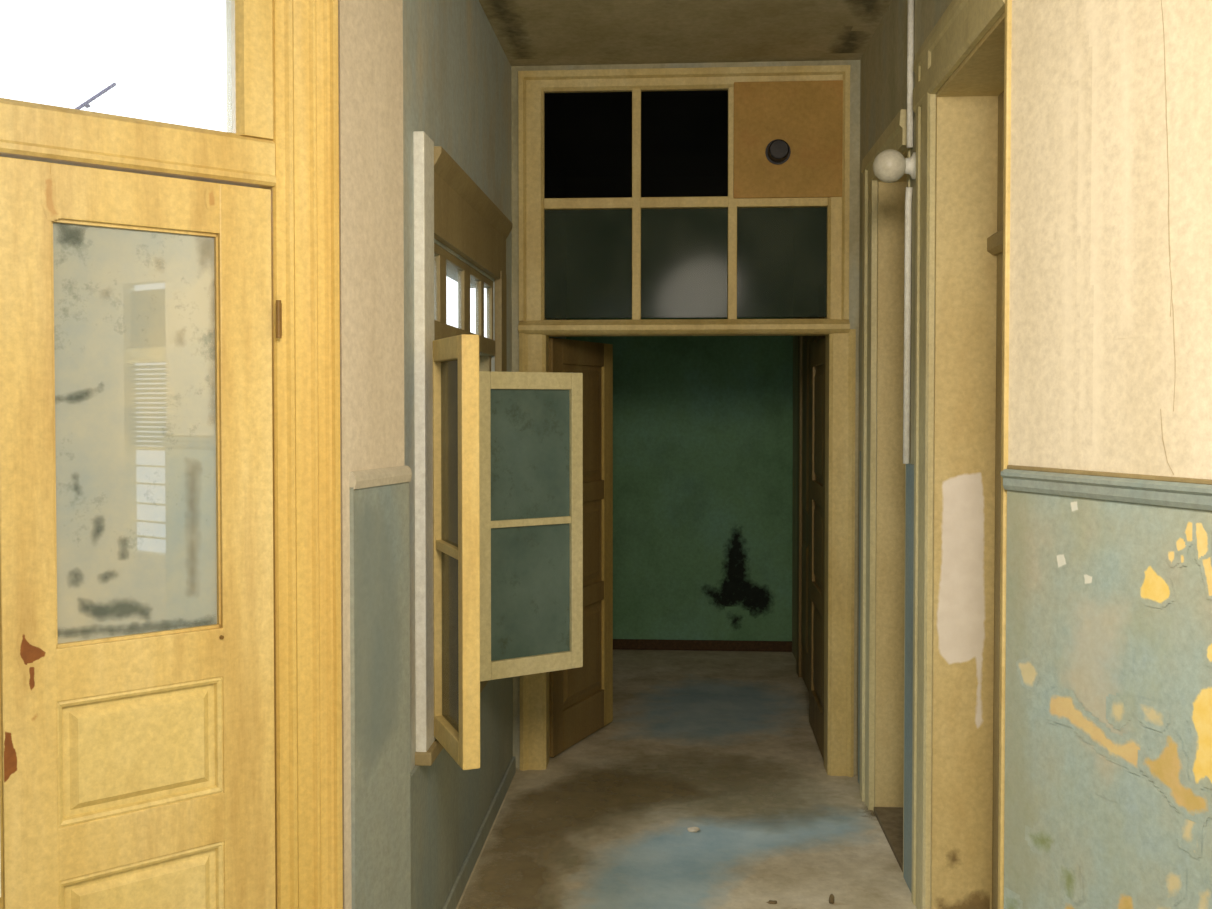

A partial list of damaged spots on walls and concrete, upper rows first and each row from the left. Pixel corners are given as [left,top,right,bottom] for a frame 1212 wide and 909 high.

damp [480,0,549,60]
damp [815,0,891,54]
peeling [1069,498,1080,514]
peeling [1054,551,1068,570]
peeling [1135,518,1212,609]
peeling [1016,638,1212,853]